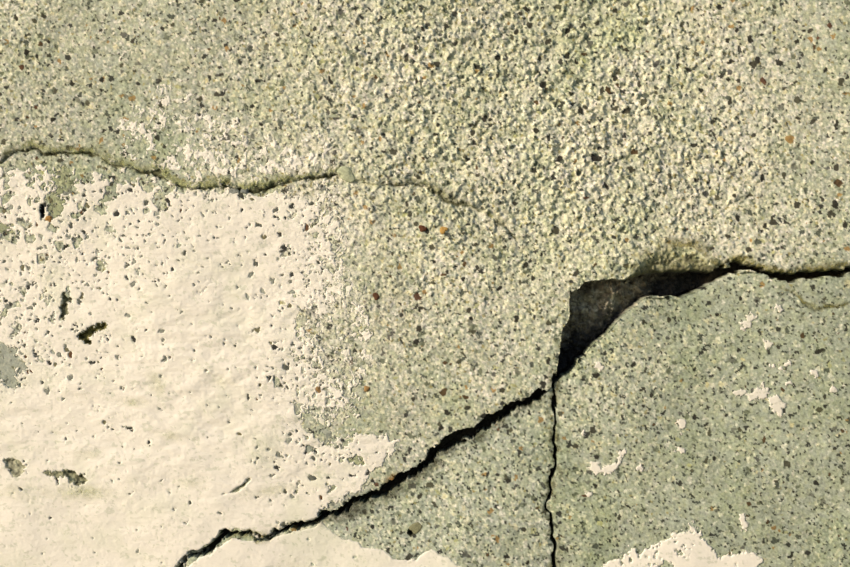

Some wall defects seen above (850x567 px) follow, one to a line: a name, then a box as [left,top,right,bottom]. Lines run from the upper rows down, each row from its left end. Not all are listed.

crack [0,146,340,194]
crack [362,181,525,256]
crack [706,260,850,284]
crack [802,303,847,312]
peeling [0,156,462,567]
crack [176,373,558,567]
peeling [603,521,763,567]